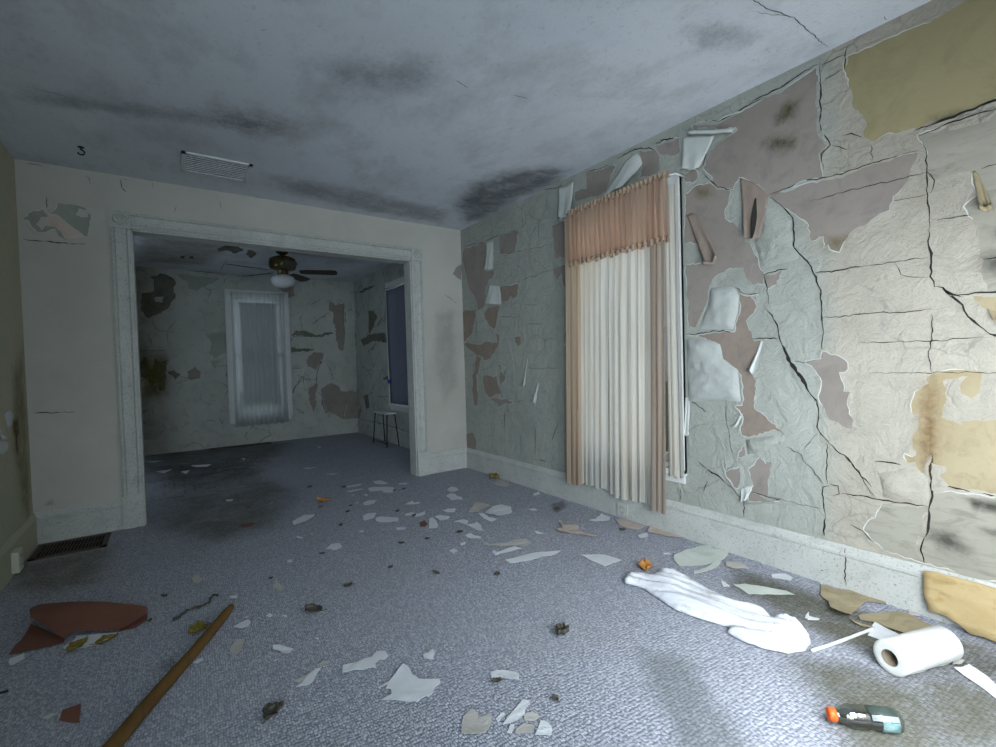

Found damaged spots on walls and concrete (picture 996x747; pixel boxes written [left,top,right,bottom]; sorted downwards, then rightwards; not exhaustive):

crack [588,0,996,586]
peeling [931,463,948,492]